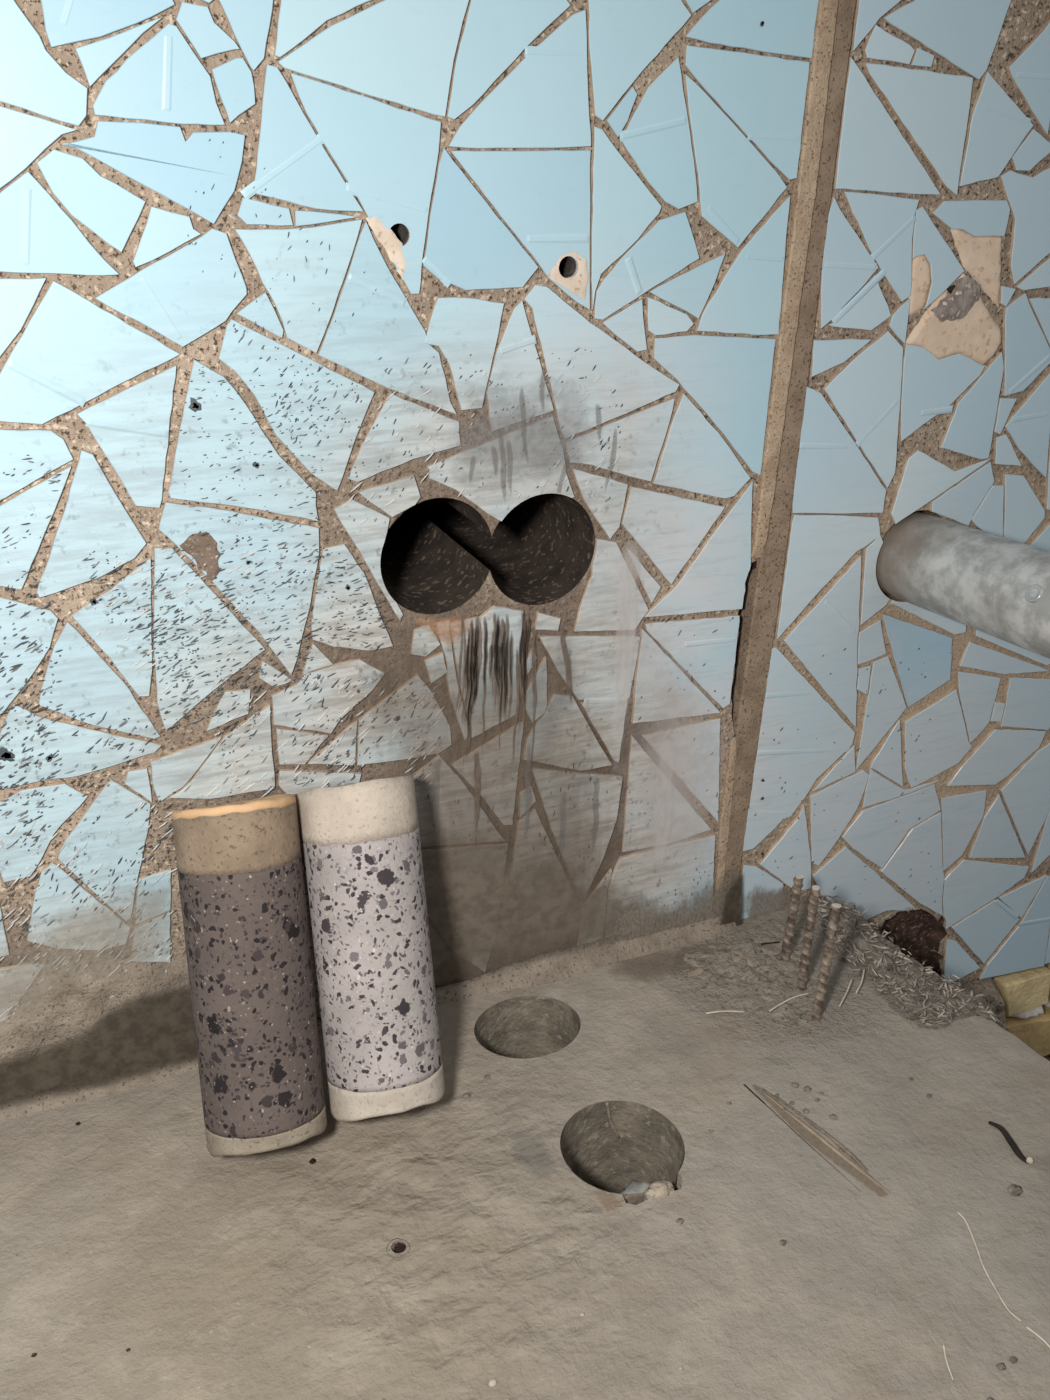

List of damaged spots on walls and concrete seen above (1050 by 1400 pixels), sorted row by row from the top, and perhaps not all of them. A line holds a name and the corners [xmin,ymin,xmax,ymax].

spalling [905,229,1002,365]
water stain [455,613,537,825]
water stain [560,629,572,699]
spalling [867,907,947,976]